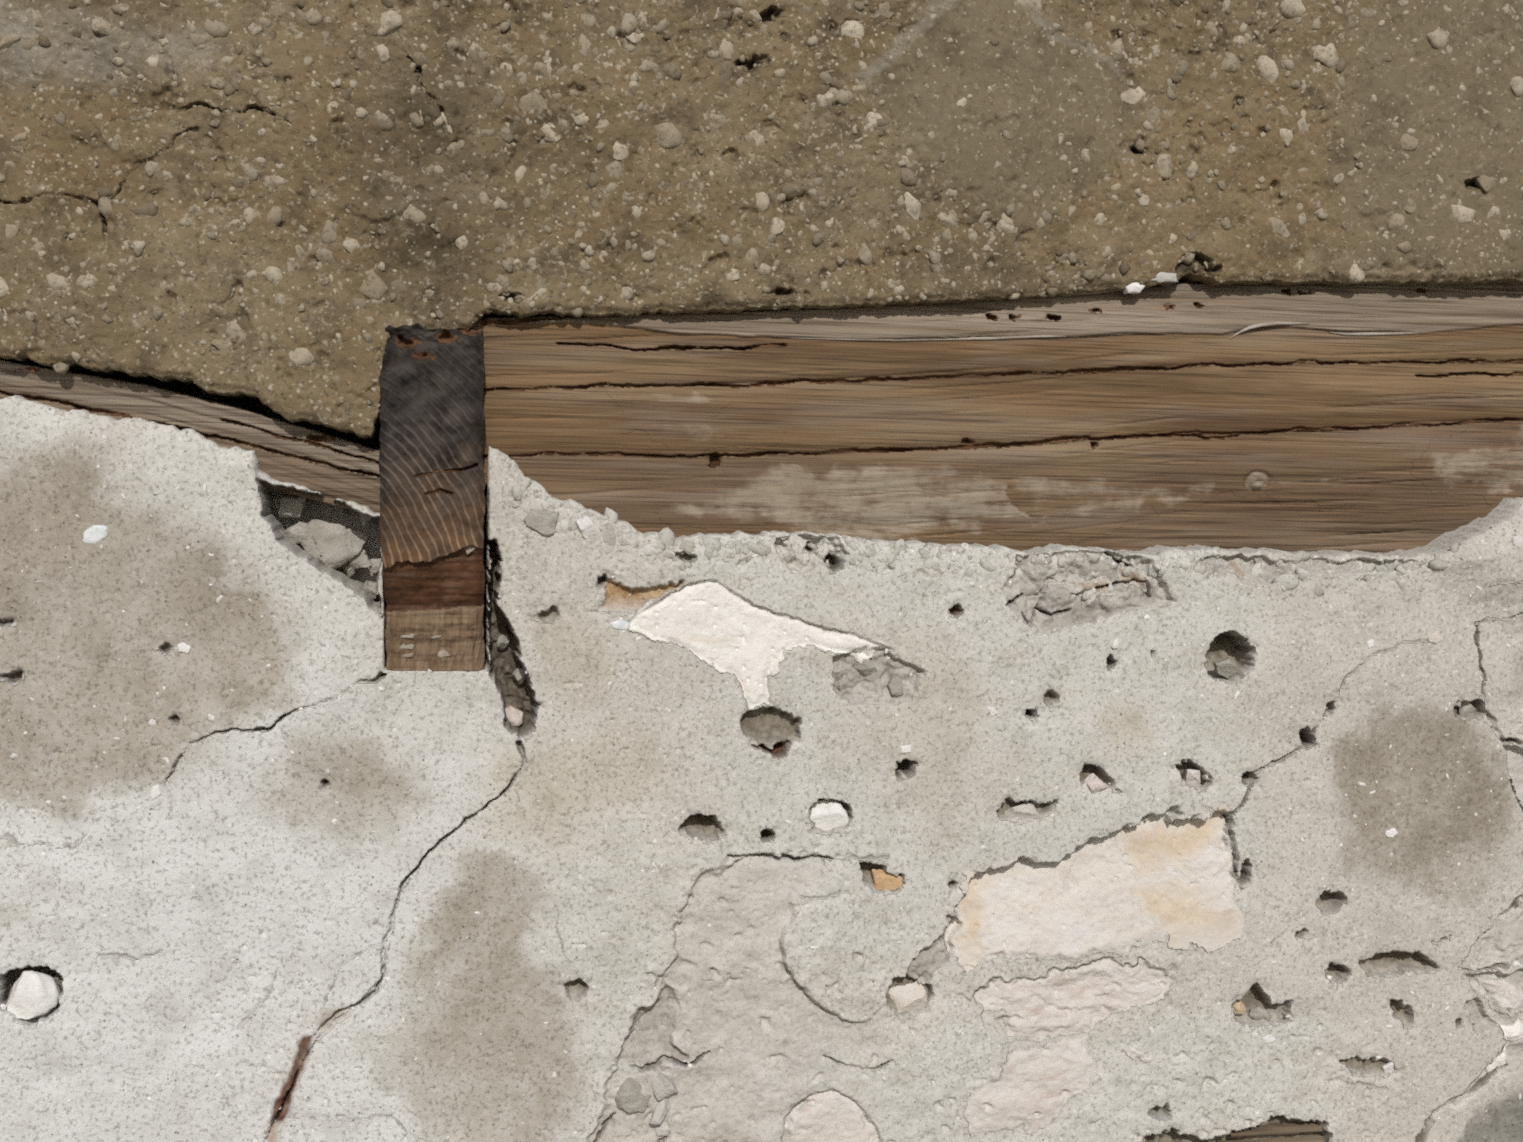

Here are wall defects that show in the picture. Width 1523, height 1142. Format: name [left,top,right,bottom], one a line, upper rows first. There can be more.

crack [164,670,387,784]
crack [313,739,528,1037]
water stain [353,573,710,1142]
spalling [595,577,928,749]
spalling [773,531,851,574]
peeling [586,805,1240,1142]
crack [1202,640,1428,891]
water stain [1312,630,1523,914]
crack [1458,895,1523,974]
crack [1474,579,1523,812]
crack [286,1113,427,1142]
crack [1415,1064,1508,1142]